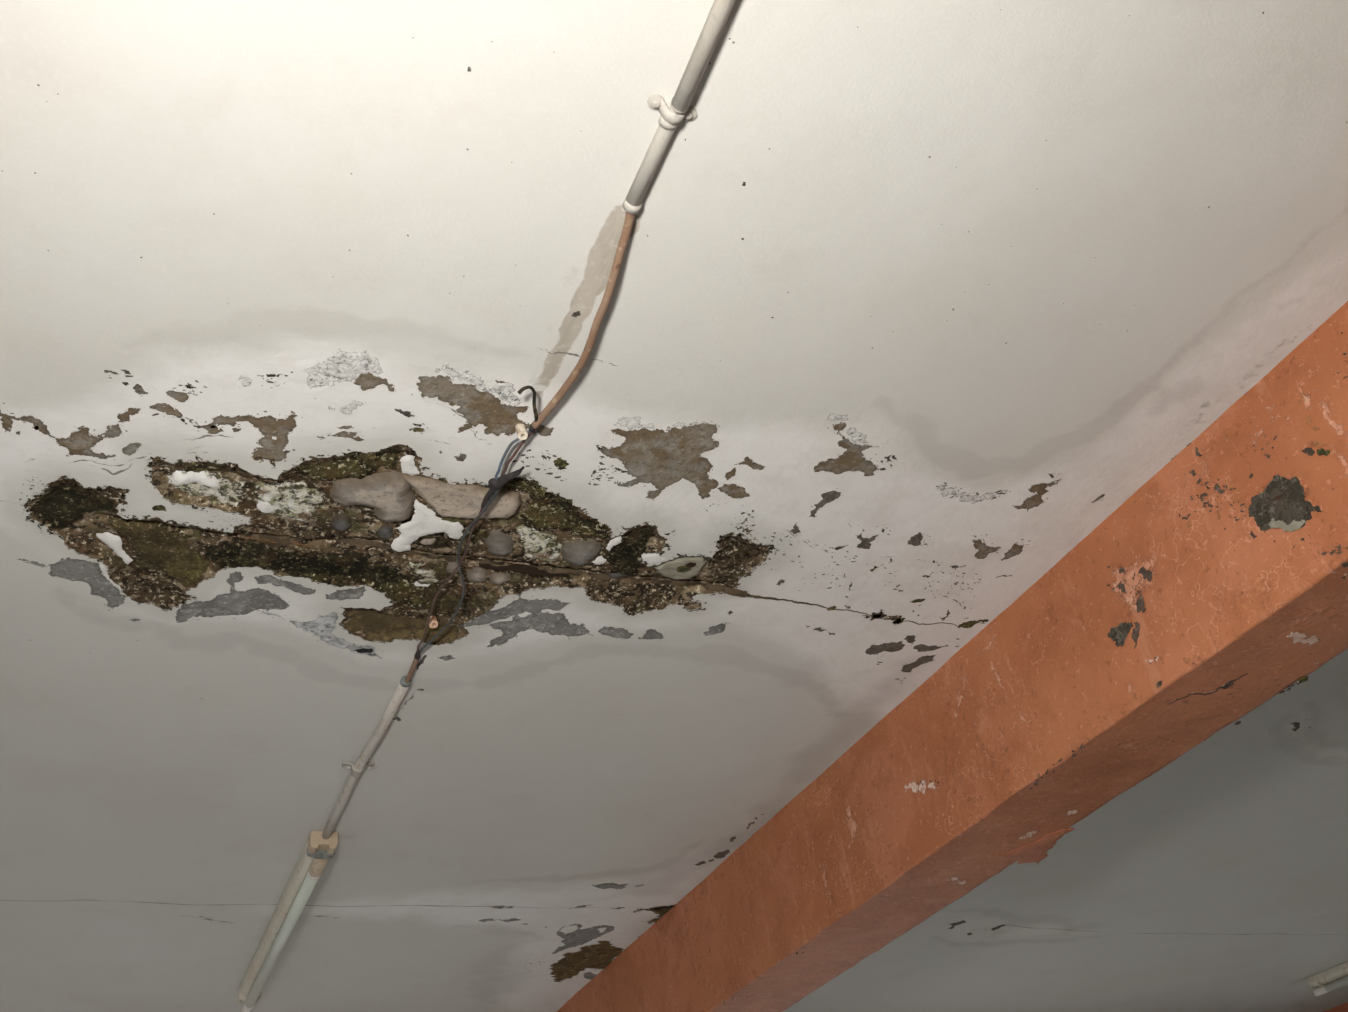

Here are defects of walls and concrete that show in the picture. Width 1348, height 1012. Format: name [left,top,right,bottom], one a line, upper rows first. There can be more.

spalling [0,196,1031,661]
damp [0,222,1348,729]
peeling [936,474,1061,512]
spalling [1176,447,1348,555]
crack [728,594,989,628]
peeling [865,635,959,683]
peeling [525,924,614,972]